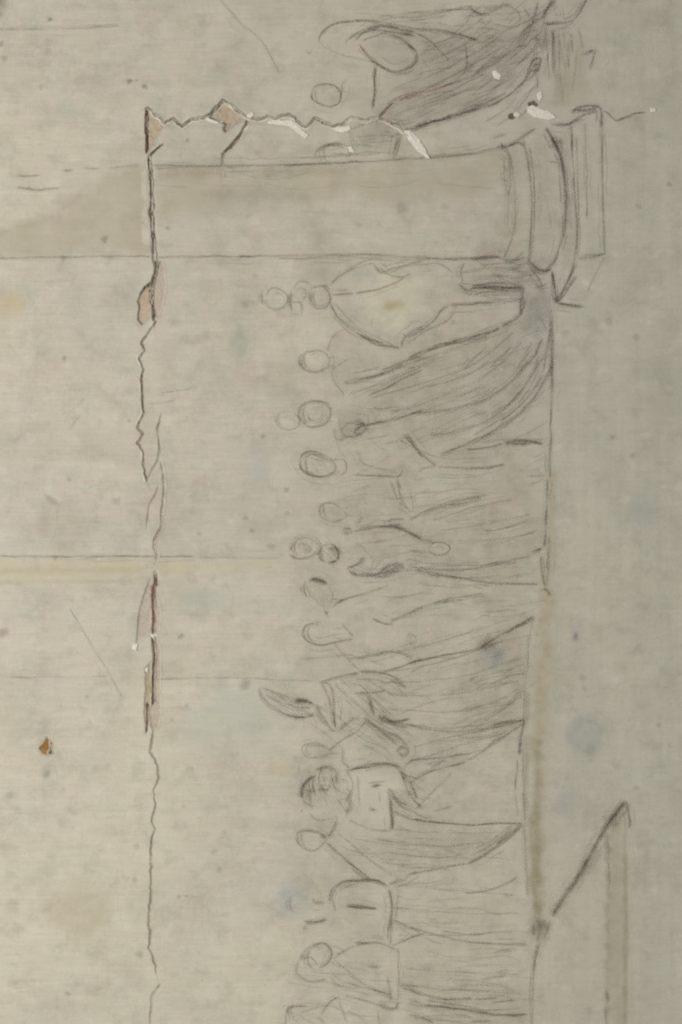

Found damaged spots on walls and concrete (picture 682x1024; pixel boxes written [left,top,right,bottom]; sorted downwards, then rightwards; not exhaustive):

spalling [145,109,166,154]
spalling [208,100,246,134]
spalling [508,91,555,120]
spalling [136,260,167,326]
crack [132,102,430,722]
spalling [135,577,163,732]
rust [35,714,67,786]